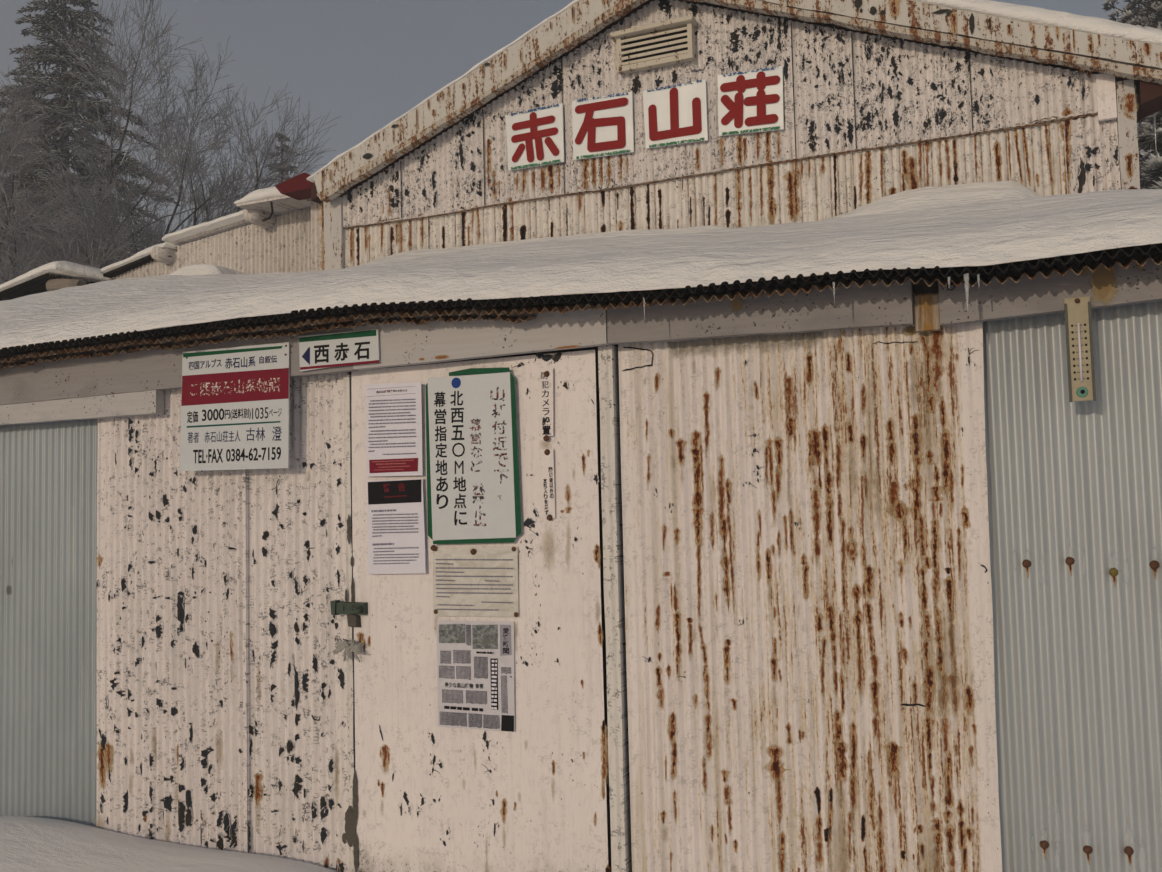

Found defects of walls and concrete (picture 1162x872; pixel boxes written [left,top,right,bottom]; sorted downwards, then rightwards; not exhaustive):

peeling [687,0,994,152]
rust [487,139,662,242]
rust [677,131,837,228]
rust [854,139,958,209]
peeling [115,417,168,481]
peeling [96,476,285,748]
peeling [295,499,344,554]
rust [655,367,735,824]
rust [756,352,902,872]
rust [886,327,976,872]
peeling [124,722,251,853]
peeling [248,568,347,855]